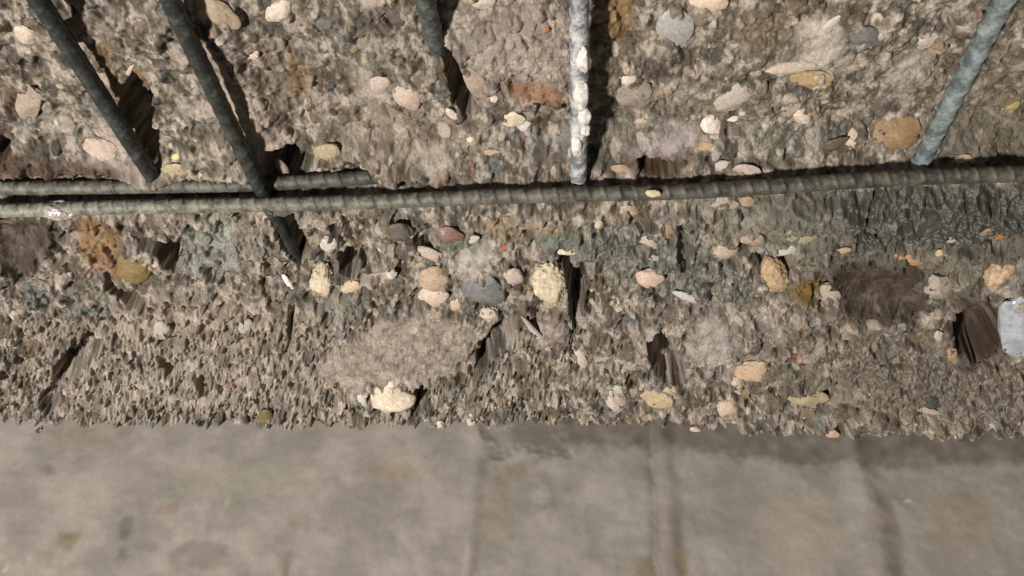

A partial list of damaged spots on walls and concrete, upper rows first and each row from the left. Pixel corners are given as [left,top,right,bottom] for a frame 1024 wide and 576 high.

spalling [0,0,1024,204]
spalling [0,165,1024,462]